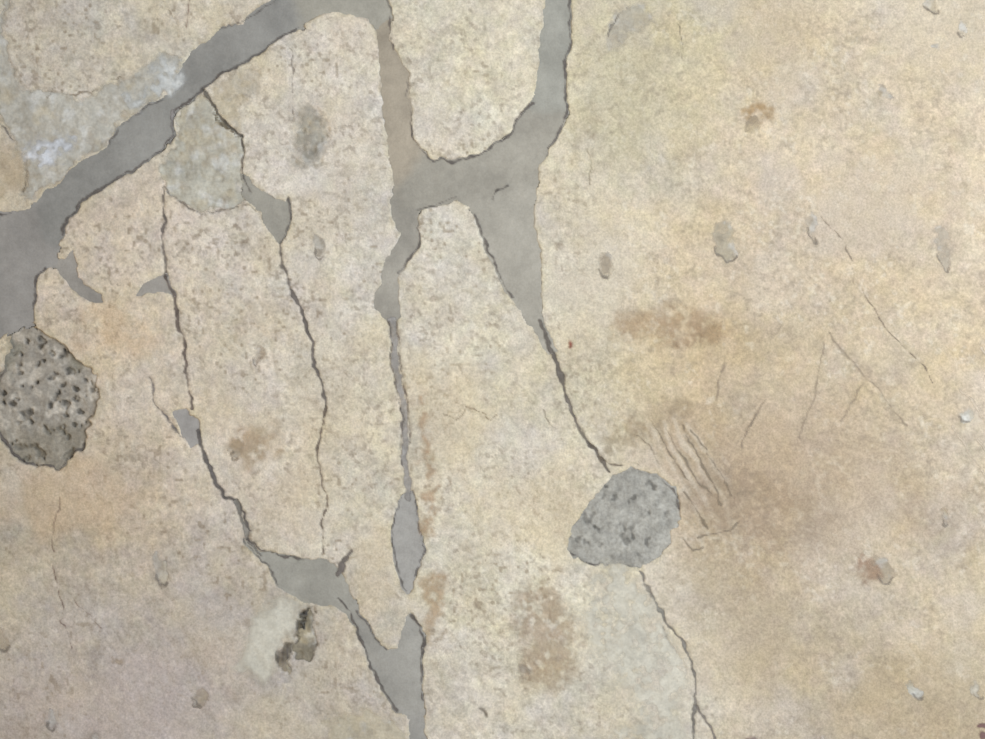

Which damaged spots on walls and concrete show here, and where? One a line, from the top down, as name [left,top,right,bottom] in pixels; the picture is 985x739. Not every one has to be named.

peeling [0,0,180,198]
flaking render [159,91,246,212]
flaking render [296,110,325,162]
crack [0,0,622,501]
flaking render [0,326,100,471]
crack [151,195,428,739]
flaking render [275,609,317,673]
crack [639,571,716,739]